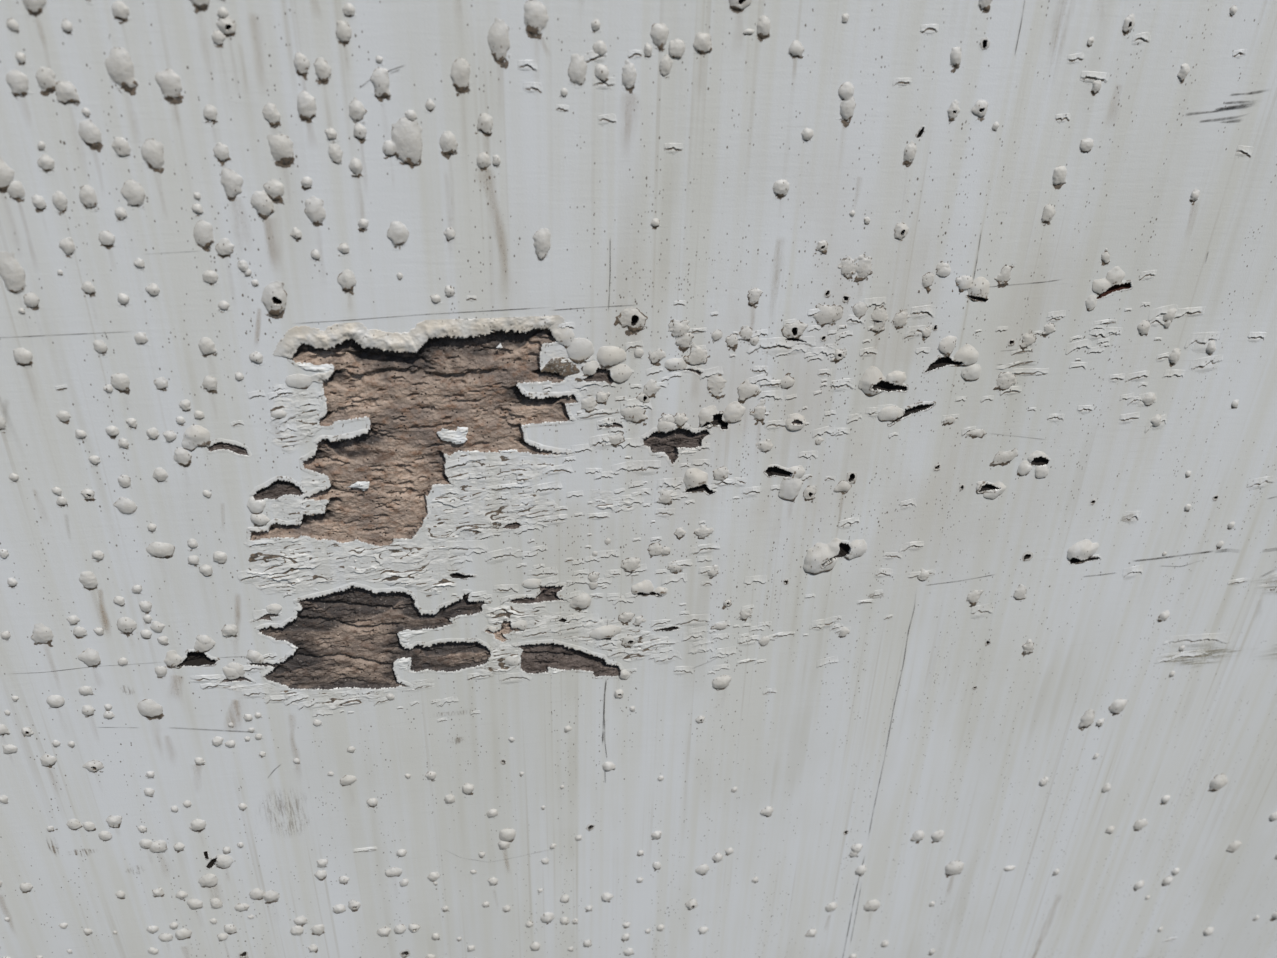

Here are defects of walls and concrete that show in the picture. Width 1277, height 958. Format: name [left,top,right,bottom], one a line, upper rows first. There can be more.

peeling [246,315,594,548]
peeling [654,448,699,458]
spalling [177,652,217,667]
peeling [246,572,631,692]